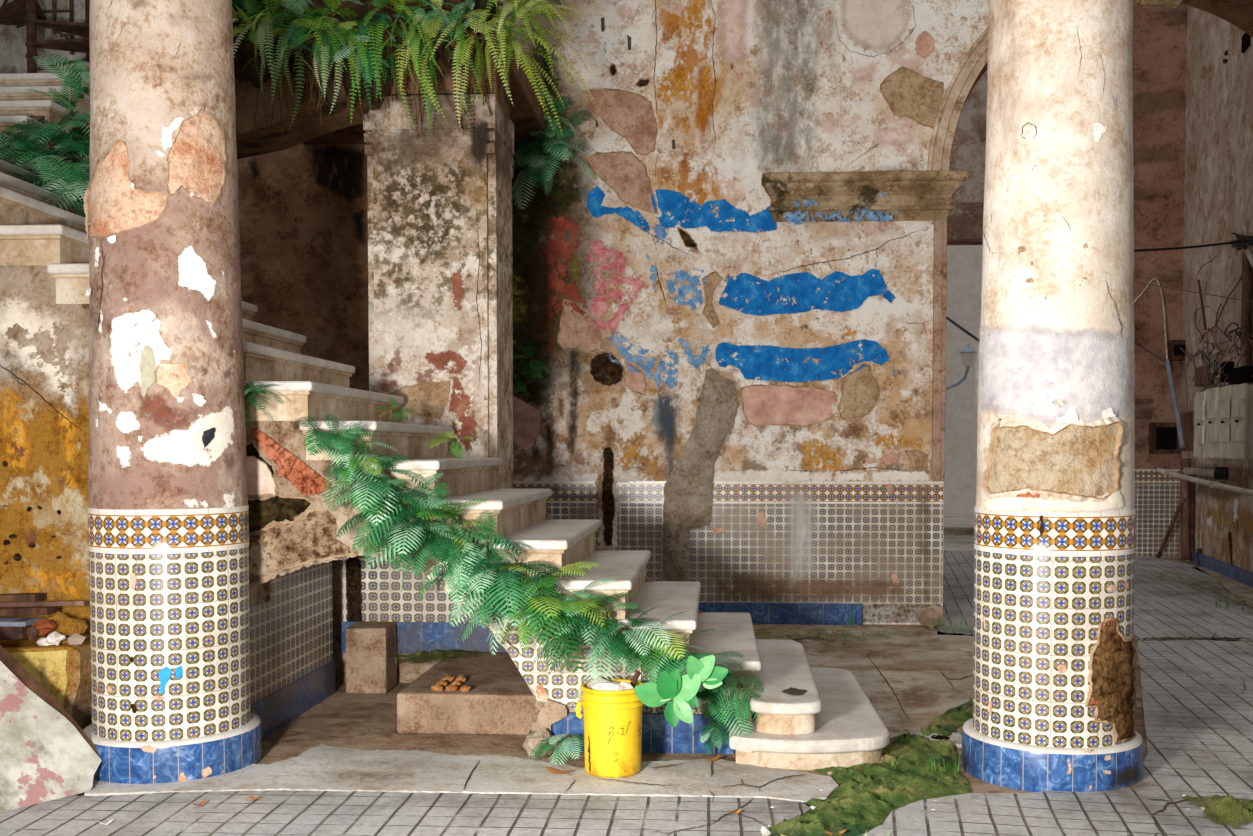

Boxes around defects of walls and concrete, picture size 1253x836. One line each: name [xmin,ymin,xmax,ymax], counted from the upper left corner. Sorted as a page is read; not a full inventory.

flaking render [83,102,229,267]
flaking render [578,60,663,221]
rust [656,0,713,136]
water stain [768,0,812,160]
flaking render [853,61,949,146]
peeling [450,272,464,311]
peeling [638,223,751,336]
flaking render [95,298,362,621]
flaking render [390,350,477,452]
flaking render [735,359,886,438]
flaking render [982,405,1125,502]
spalling [1085,617,1137,774]